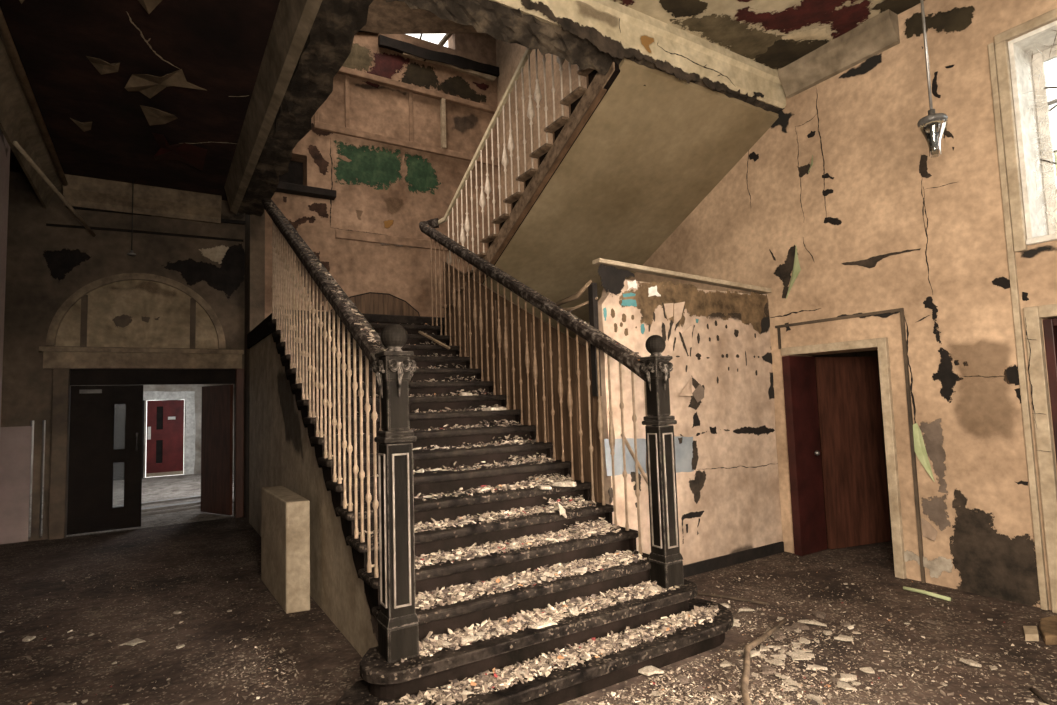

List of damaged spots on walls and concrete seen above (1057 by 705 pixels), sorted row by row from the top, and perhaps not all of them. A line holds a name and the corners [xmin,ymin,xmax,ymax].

spalling [521,0,733,93]
peeling [735,0,873,41]
spalling [904,5,975,49]
peeling [932,65,954,98]
peeling [307,123,441,194]
peeling [919,155,932,178]
spalling [824,217,842,225]
spalling [162,243,245,298]
peeling [769,245,798,299]
crack [904,181,956,423]
spalling [598,264,775,544]
spalling [904,418,1040,607]